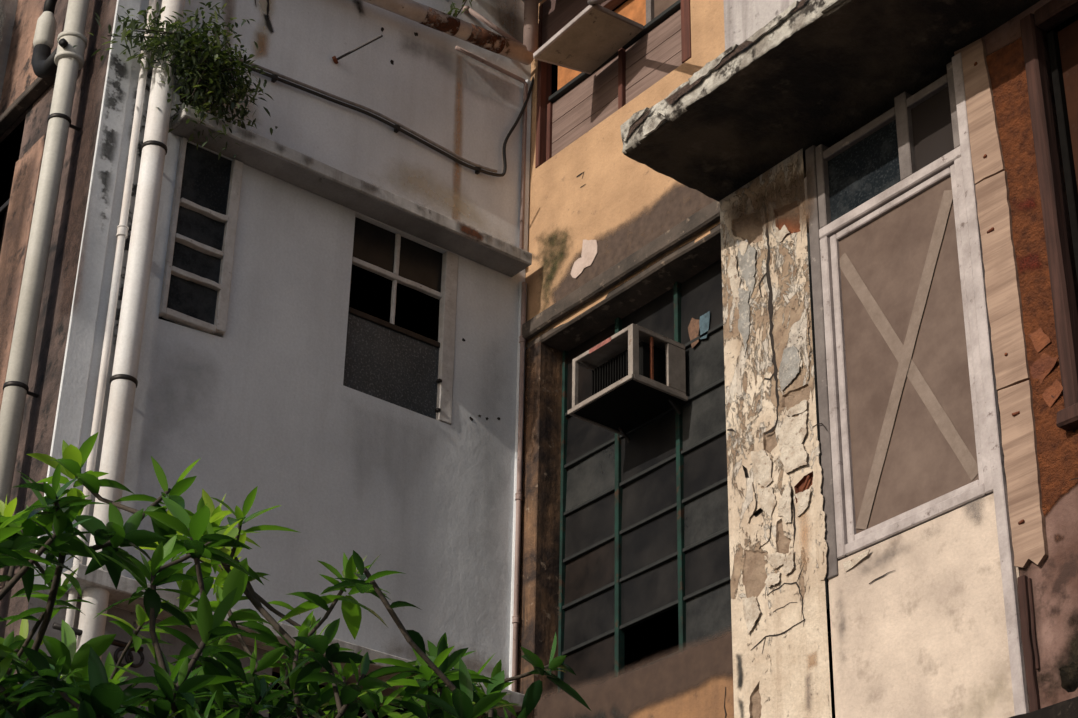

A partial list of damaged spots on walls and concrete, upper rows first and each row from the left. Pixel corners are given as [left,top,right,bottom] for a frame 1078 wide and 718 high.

rust [420,6,506,54]
peeling [620,0,806,142]
leakage [62,0,153,310]
rust [454,57,484,241]
leakage [115,267,125,341]
peeling [571,240,598,279]
leakage [552,185,716,303]
peeling [727,217,801,355]
crack [758,225,779,435]
spalling [986,36,1078,516]